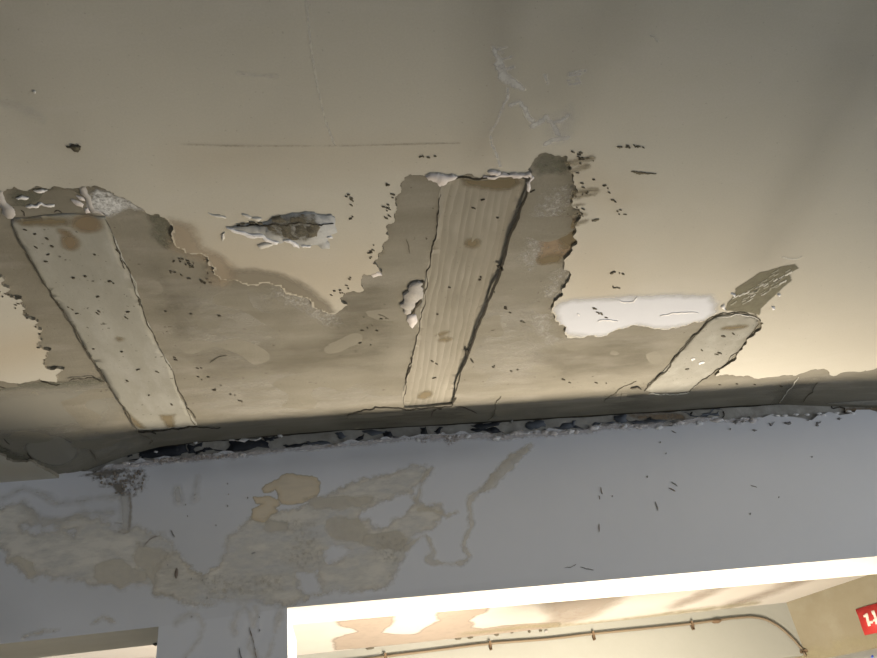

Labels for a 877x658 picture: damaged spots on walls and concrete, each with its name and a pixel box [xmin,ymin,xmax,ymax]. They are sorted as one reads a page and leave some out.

crack [12,173,780,447]
flaking render [0,151,877,478]
water stain [0,465,443,606]